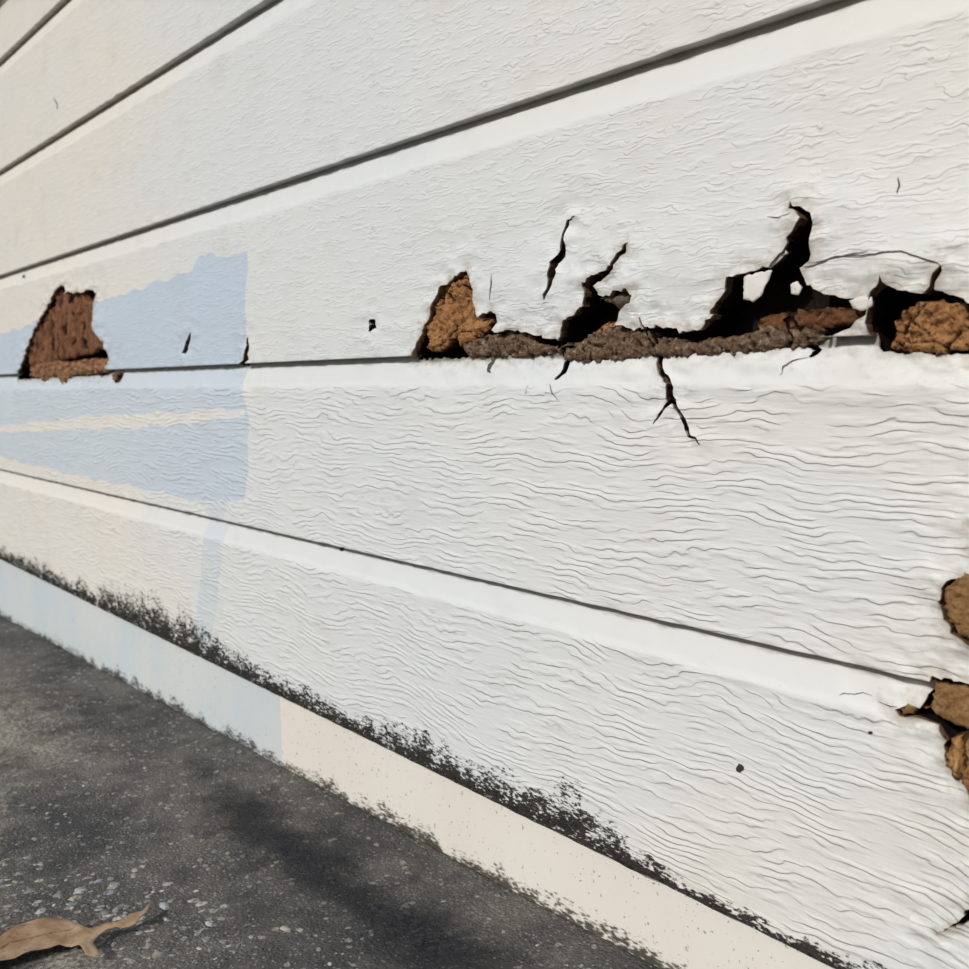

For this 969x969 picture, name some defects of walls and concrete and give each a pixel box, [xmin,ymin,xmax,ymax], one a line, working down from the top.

spalling [20,286,94,380]
spalling [416,272,469,360]
crack [551,246,566,267]
spalling [541,267,623,349]
spalling [638,207,969,354]
crack [640,319,700,445]
mould [0,546,887,969]
spalling [900,678,968,748]